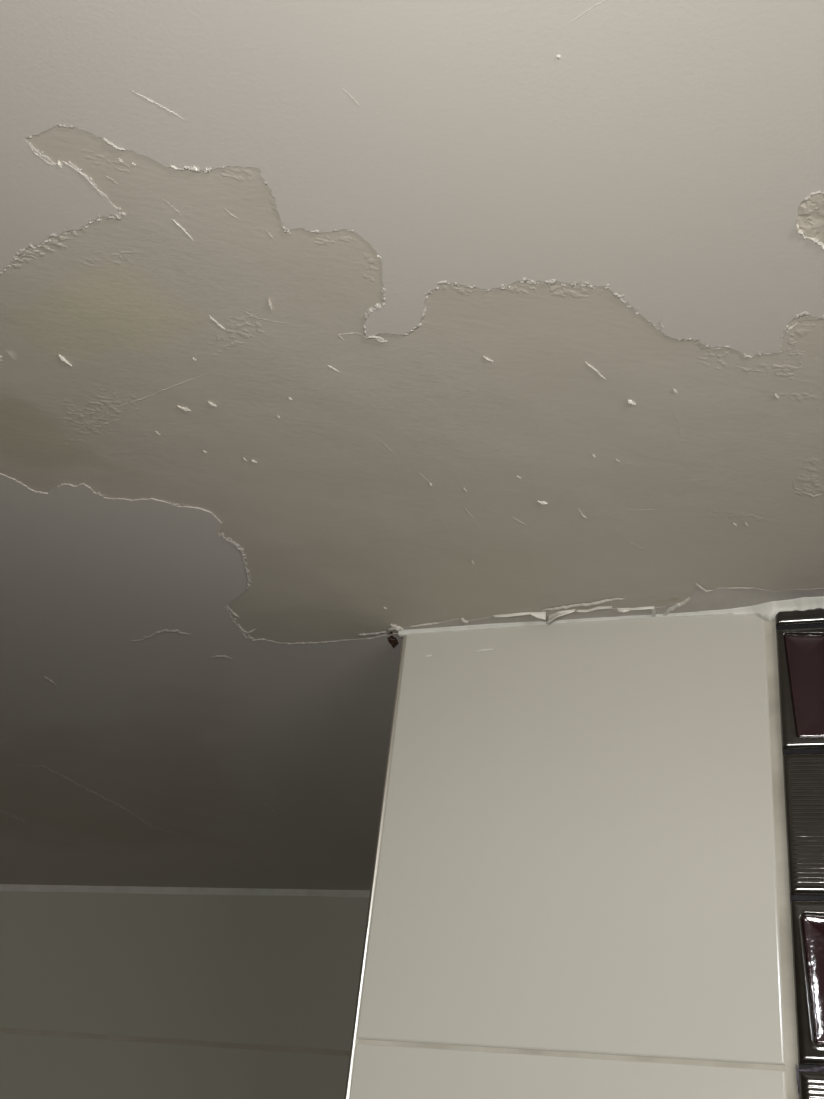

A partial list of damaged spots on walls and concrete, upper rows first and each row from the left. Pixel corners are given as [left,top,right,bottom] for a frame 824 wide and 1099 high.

peeling [0,124,824,645]